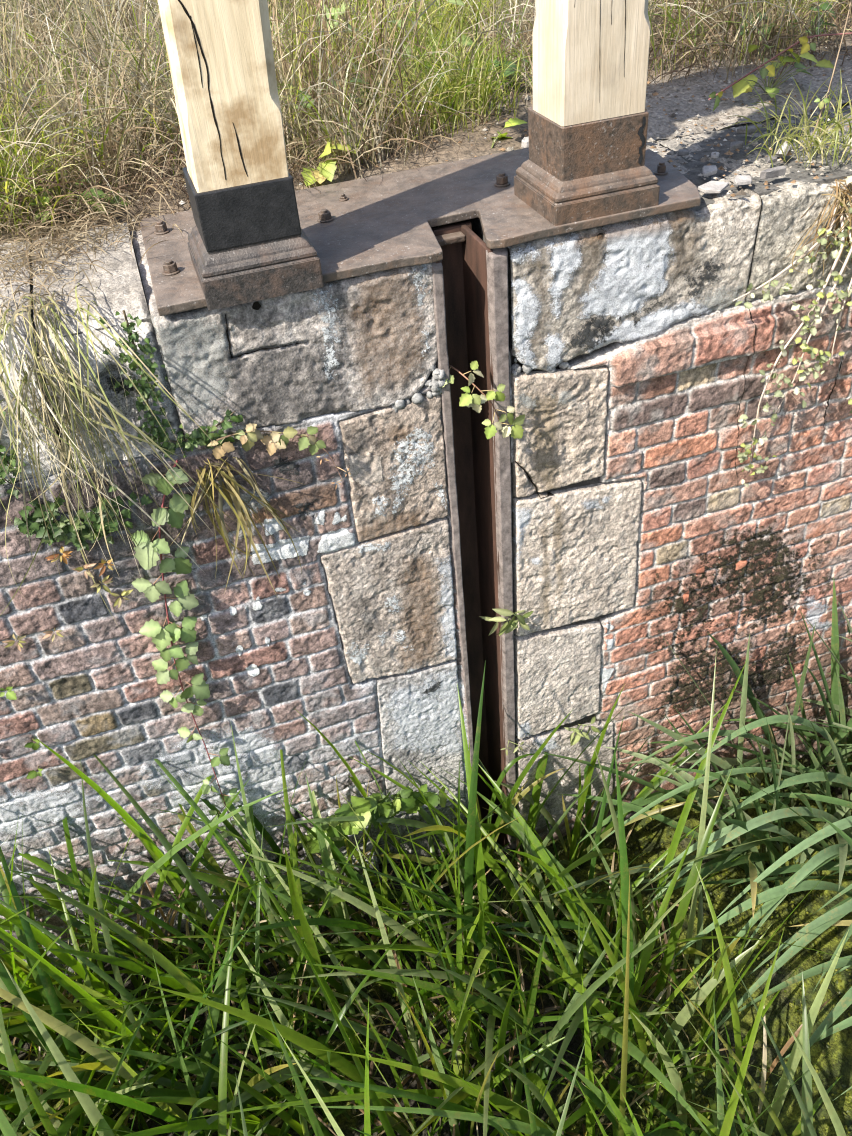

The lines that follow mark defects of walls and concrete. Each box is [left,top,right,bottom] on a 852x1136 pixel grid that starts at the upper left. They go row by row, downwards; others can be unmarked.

crack [178,0,248,180]